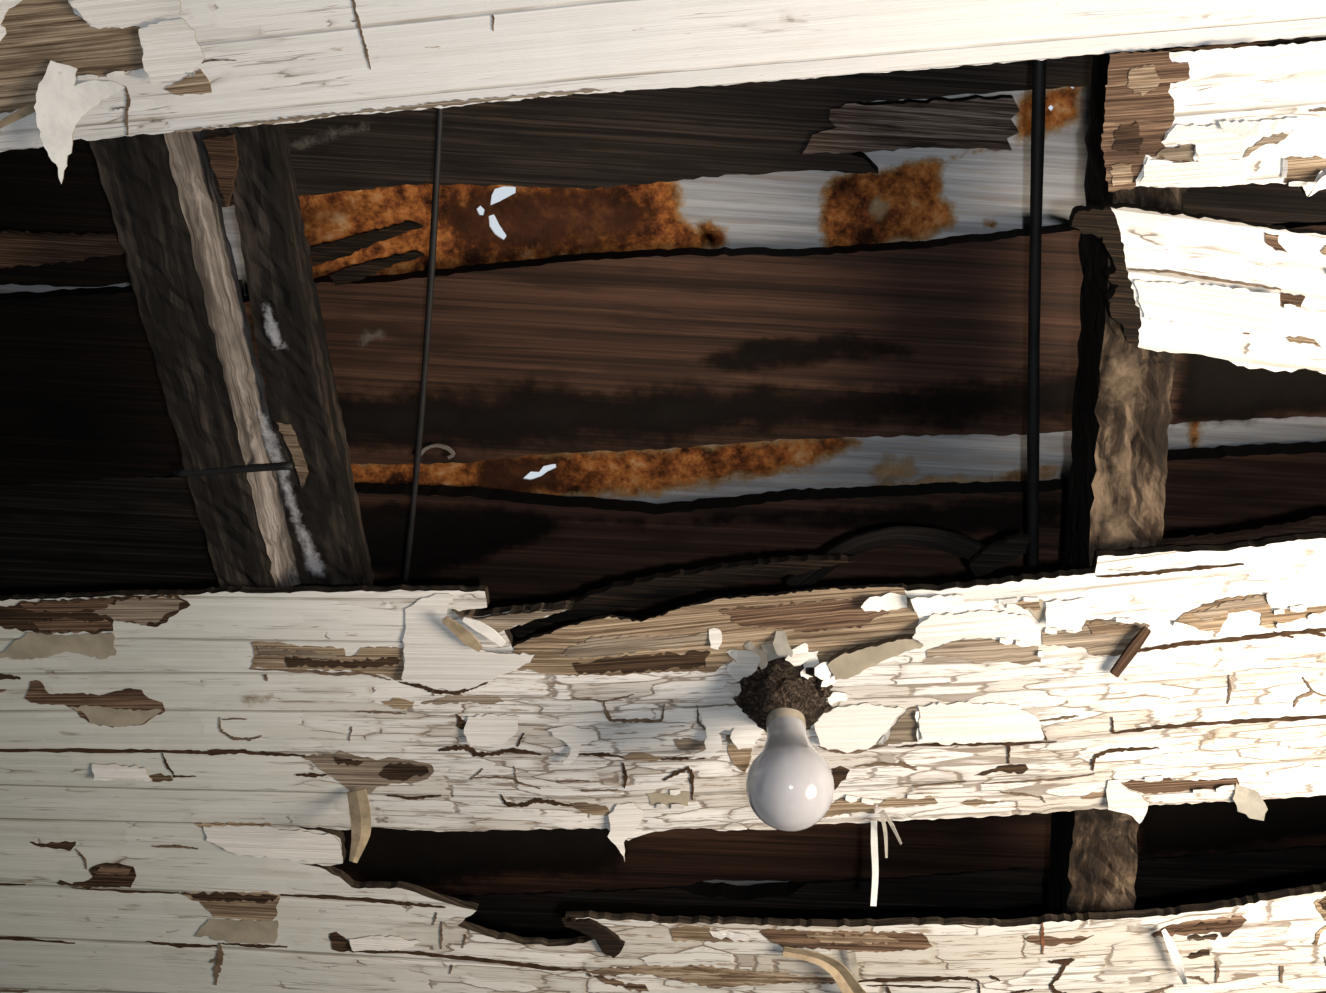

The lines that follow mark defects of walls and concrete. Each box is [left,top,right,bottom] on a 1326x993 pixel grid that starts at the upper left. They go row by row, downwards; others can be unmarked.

peeling [0,0,144,114]
peeling [1101,50,1195,192]
rust [299,181,725,279]
rust [821,160,953,248]
rust [351,438,857,496]
peeling [513,587,1150,676]
crack [1138,628,1326,653]
crack [819,675,1326,803]
peeling [1121,775,1240,794]
crack [857,922,1075,993]
crack [1145,961,1220,993]
peeling [1151,915,1247,959]